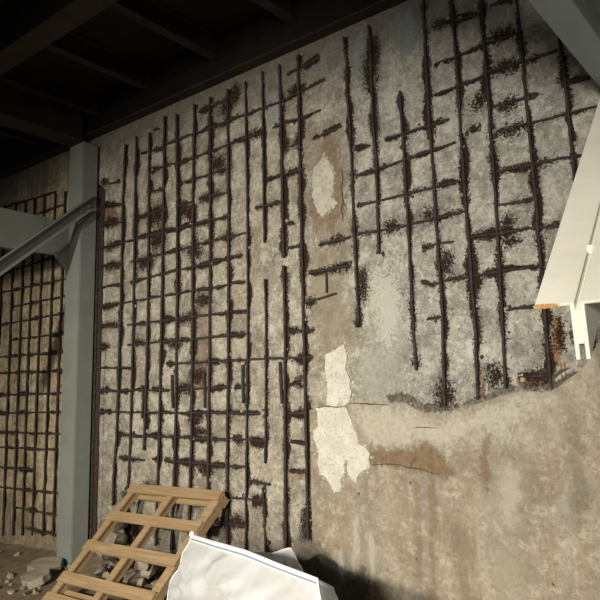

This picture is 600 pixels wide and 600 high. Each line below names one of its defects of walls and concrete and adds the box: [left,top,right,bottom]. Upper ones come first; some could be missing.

spalling [312,121,343,141]
flaking render [310,152,337,217]
spalling [3,191,68,220]
spalling [318,232,351,248]
rust [552,317,566,380]
spalling [0,253,65,537]
crack [316,401,388,409]
crack [369,457,436,474]
damp [369,441,453,477]
flaking render [405,438,422,453]
flaking render [428,442,447,462]
rust [119,524,144,540]